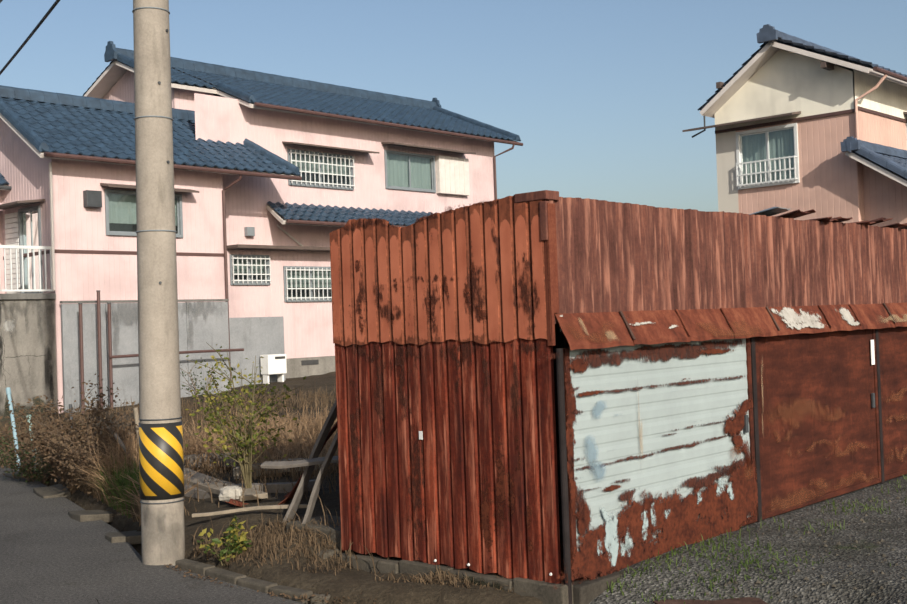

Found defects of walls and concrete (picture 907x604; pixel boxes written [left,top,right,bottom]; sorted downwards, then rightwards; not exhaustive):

corrosion [341,218,402,231]
corrosion [415,201,501,281]
peeling [771,307,824,330]
peeling [839,307,860,326]
corrosion [335,255,760,589]
peeling [716,478,734,500]
peeling [597,508,633,566]
peeling [642,503,670,540]